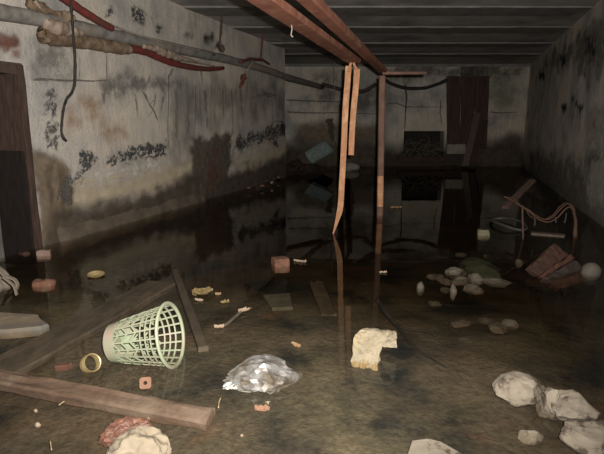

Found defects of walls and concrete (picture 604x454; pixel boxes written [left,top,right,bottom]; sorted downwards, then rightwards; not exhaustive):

water stain [131,6,145,24]
water stain [199,85,378,202]
water stain [33,152,199,261]